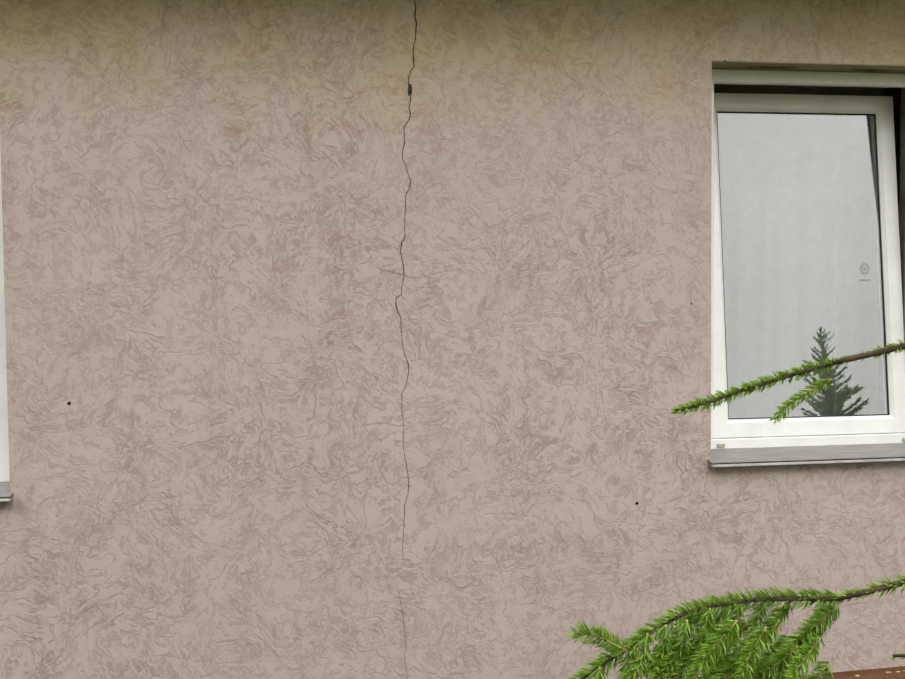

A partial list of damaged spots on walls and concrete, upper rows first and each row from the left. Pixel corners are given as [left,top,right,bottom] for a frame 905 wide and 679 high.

crack [362,0,417,560]